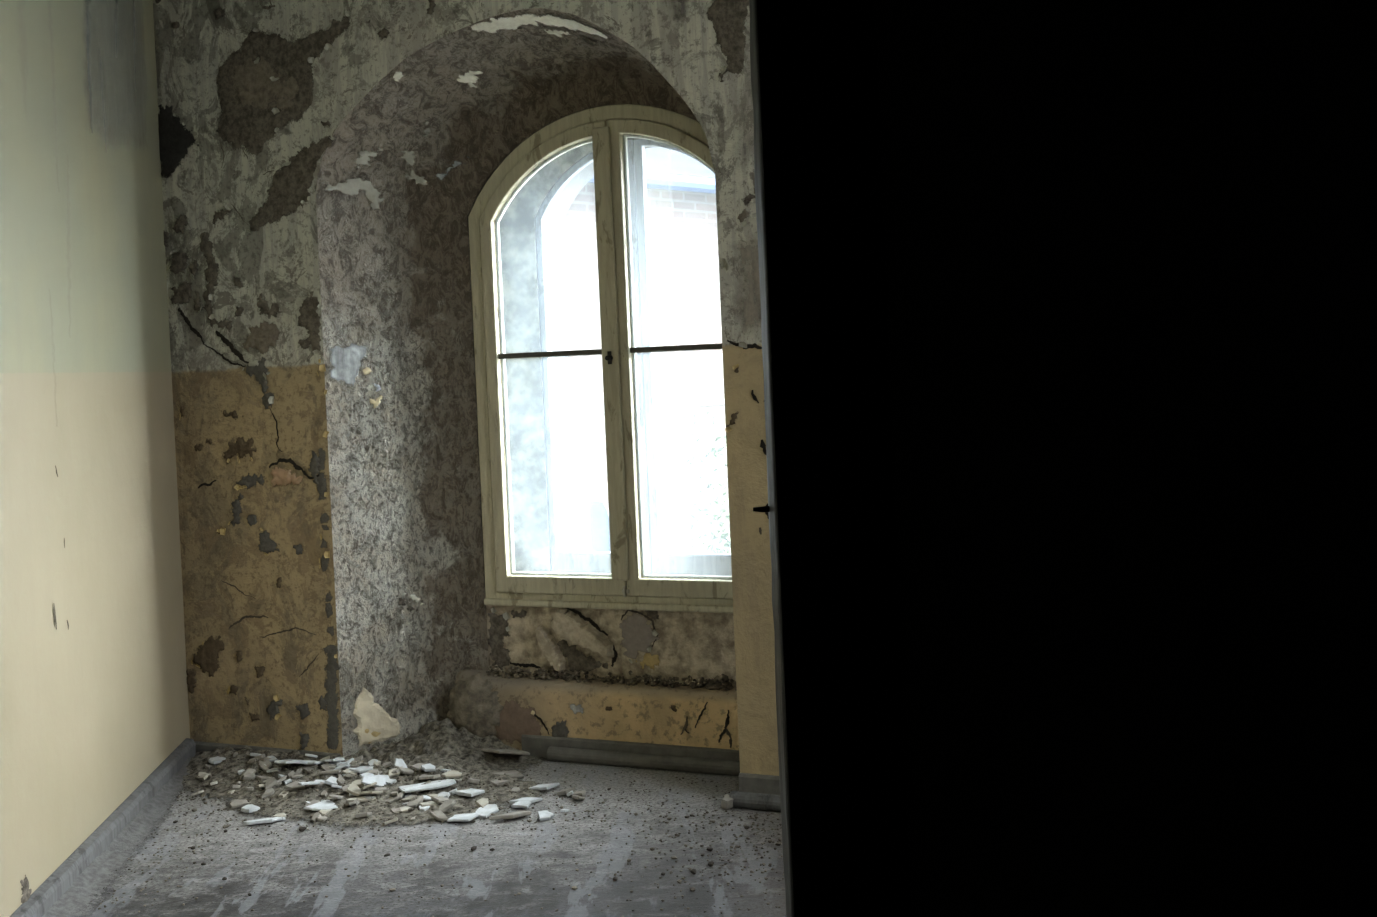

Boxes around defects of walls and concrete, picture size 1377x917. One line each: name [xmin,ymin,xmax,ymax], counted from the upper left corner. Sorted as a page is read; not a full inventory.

flaking render [212,11,390,168]
peeling [456,70,483,88]
flaking render [471,13,608,45]
peeling [704,0,749,82]
peeling [156,100,199,178]
peeling [164,117,384,452]
crack [178,307,249,367]
peeling [194,437,303,556]
crack [269,458,319,488]
peeling [186,635,265,693]
peeling [227,592,402,750]
flaking render [488,607,660,673]